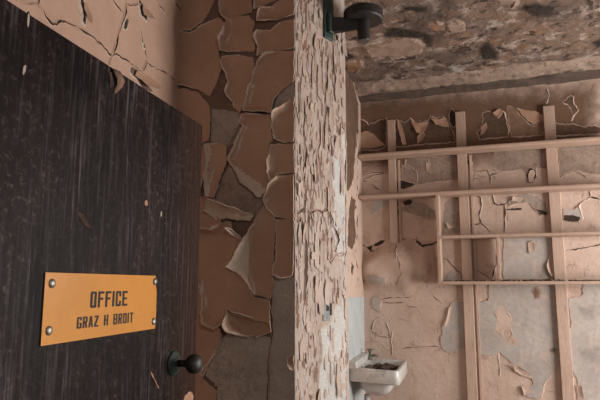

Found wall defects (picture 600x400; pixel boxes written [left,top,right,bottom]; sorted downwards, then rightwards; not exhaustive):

damp [524,5,553,16]
damp [386,29,432,46]
damp [481,43,497,59]
peeling [395,109,456,147]
peeling [476,106,544,140]
peeling [555,95,600,137]
peeling [177,0,426,400]
crack [567,243,600,252]
crack [382,236,497,308]
crack [368,320,441,355]
peeling [439,300,465,354]
peeling [474,237,559,400]